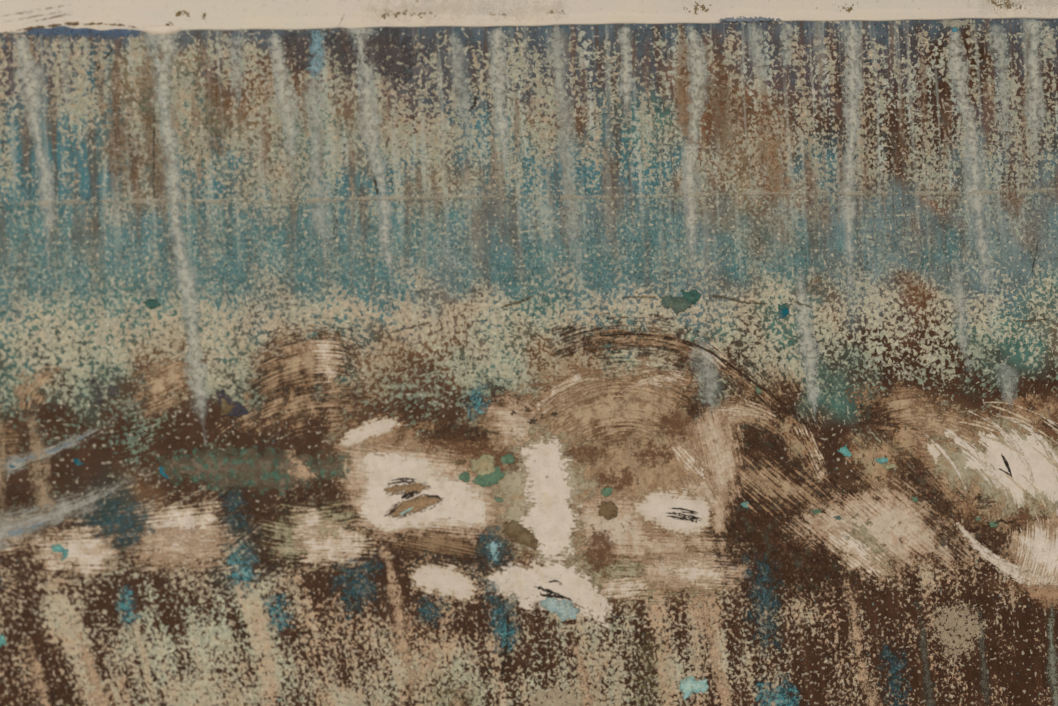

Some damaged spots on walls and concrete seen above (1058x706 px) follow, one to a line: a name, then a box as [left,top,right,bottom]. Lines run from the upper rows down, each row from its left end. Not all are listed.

water stain [17,38,54,237]
water stain [146,9,207,417]
water stain [269,30,325,232]
water stain [350,28,391,274]
water stain [489,29,508,158]
water stain [618,27,632,120]
water stain [682,28,709,267]
water stain [838,2,863,263]
water stain [949,32,988,285]
water stain [1025,20,1044,148]
water stain [797,278,820,411]
water stain [0,421,84,507]